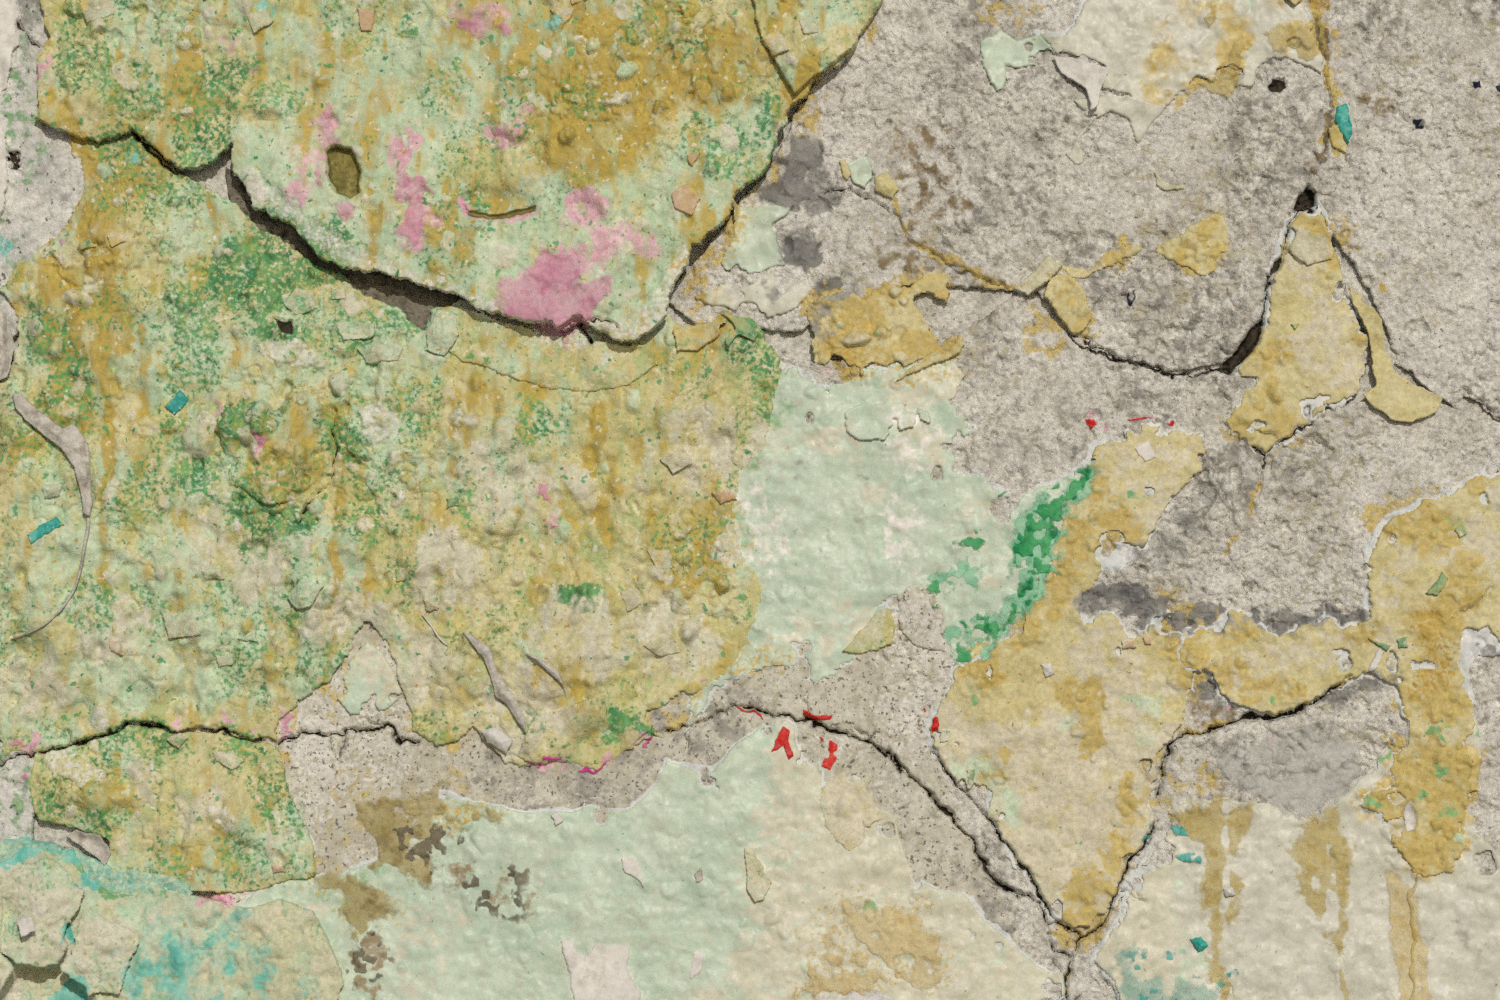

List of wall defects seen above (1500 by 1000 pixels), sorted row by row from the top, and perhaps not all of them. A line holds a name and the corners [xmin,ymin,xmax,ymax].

peeling [0,0,782,897]
crack [824,174,1009,290]
spalling [669,0,1340,385]
crack [1073,211,1370,380]
crack [1252,424,1313,468]
spalling [1136,0,1500,877]
crack [1314,18,1333,175]
crack [0,722,419,767]
peeling [0,293,1257,1000]
crack [666,684,1341,1000]